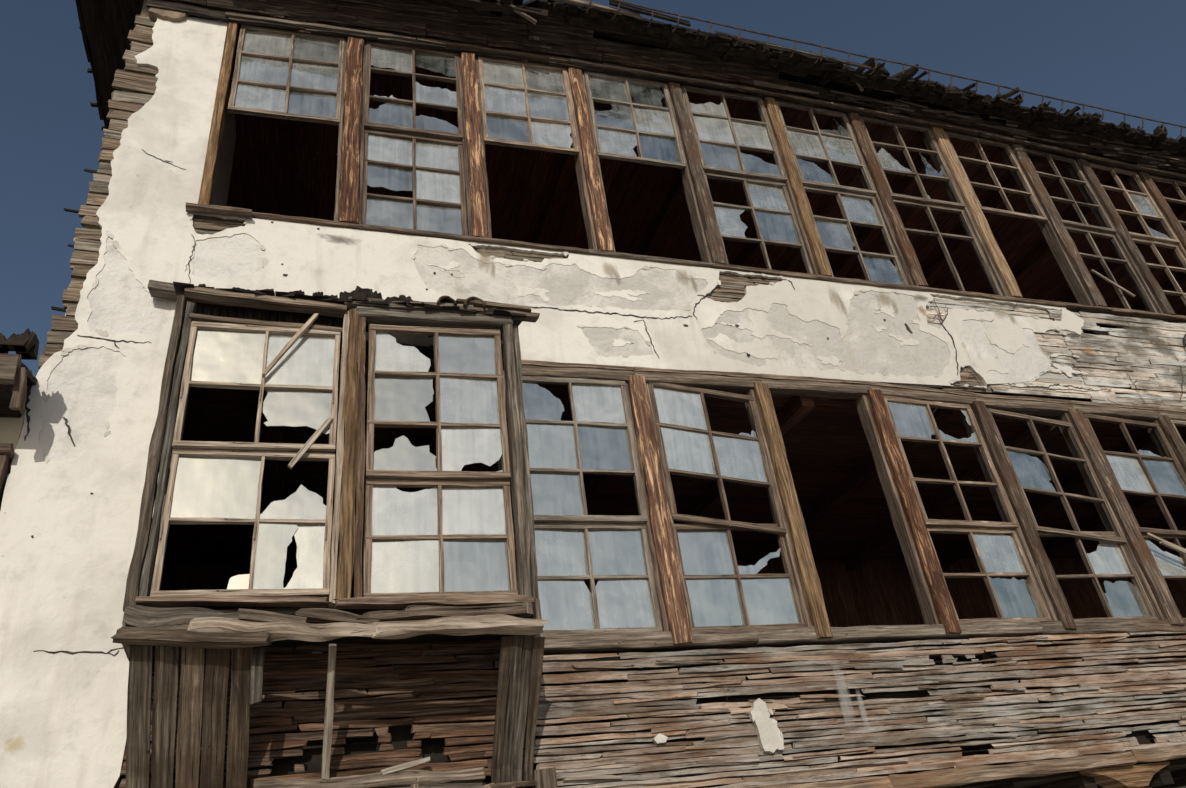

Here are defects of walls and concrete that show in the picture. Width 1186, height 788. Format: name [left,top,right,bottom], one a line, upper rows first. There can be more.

peeling [39,230,172,464]
crack [530,288,715,357]
peeling [411,242,1080,394]
crack [33,647,123,656]